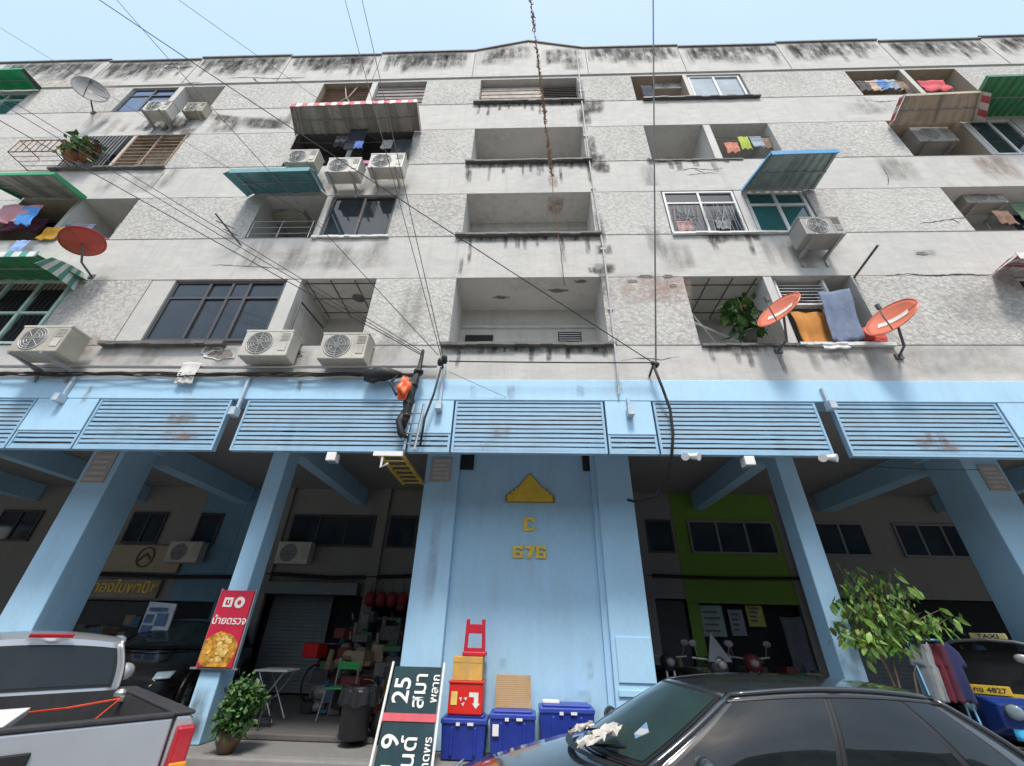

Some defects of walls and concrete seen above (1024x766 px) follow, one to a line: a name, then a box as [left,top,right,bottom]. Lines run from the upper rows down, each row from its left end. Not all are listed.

damp [202,57,372,73]
damp [387,54,467,70]
damp [215,115,280,129]